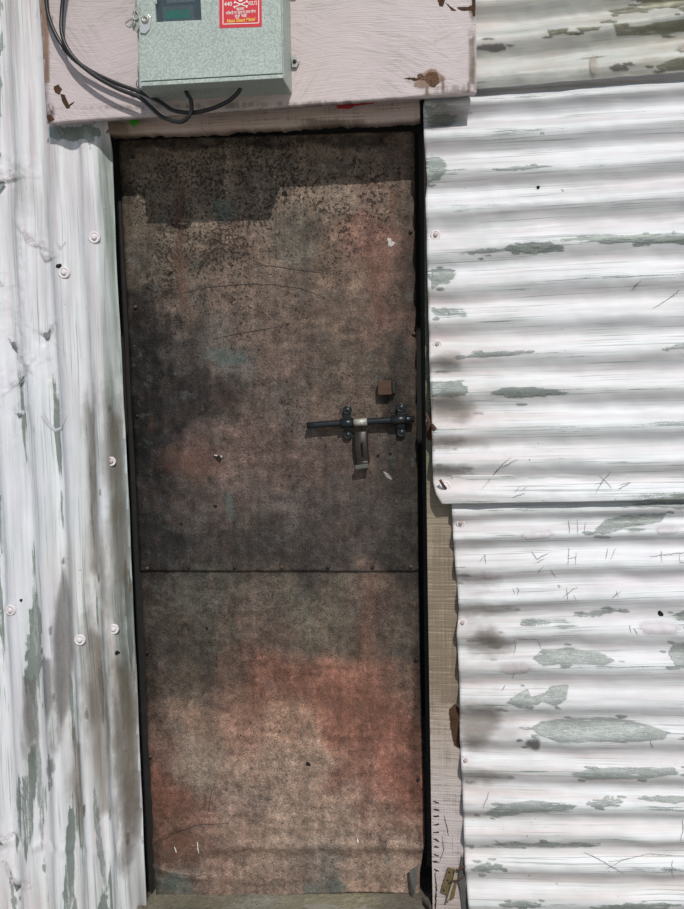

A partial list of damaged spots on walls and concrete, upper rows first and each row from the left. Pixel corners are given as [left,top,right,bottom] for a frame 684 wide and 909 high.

rust [438,0,476,16]
peeling [544,0,684,38]
rust [41,0,74,108]
peeling [646,57,684,73]
rust [405,69,444,95]
peeling [595,233,684,247]
peeling [463,241,556,259]
peeling [584,502,684,539]
peeling [573,766,684,782]
peeling [475,801,575,820]
peeling [94,790,108,899]
peeling [466,840,600,849]